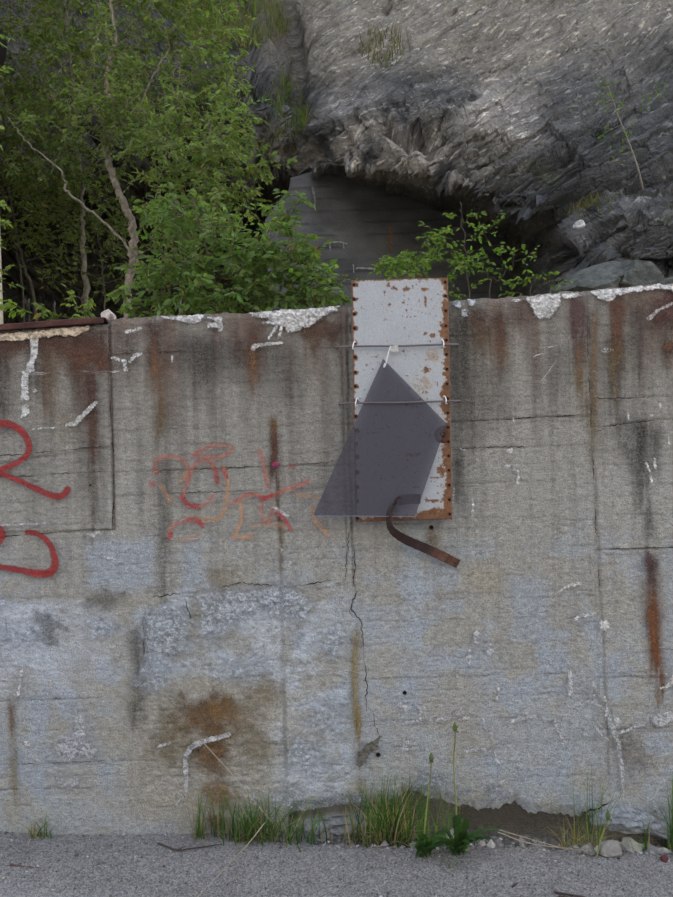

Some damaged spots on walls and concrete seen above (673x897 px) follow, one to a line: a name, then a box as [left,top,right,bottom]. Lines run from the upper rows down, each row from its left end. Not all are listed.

damp [0,325,90,341]
crack [153,530,379,735]
rust [645,552,664,704]
rust [159,693,267,809]
peeling [585,678,673,792]